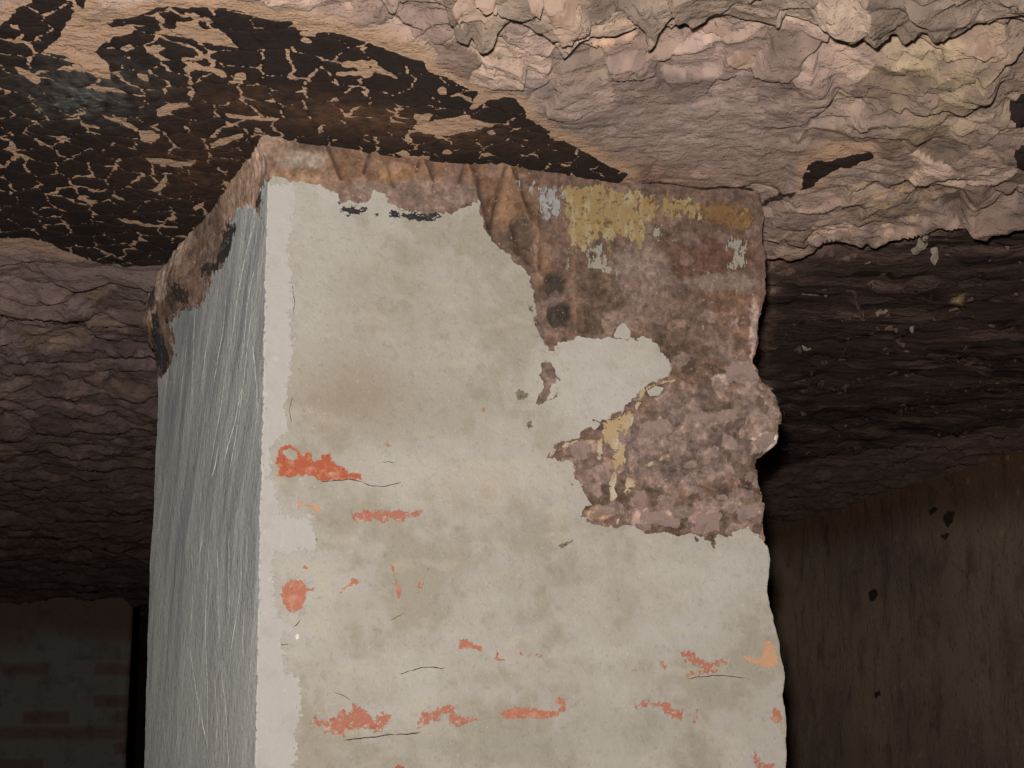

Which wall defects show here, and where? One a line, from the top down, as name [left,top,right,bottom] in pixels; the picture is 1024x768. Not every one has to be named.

damp [338,201,442,222]
damp [151,312,170,375]
damp [179,219,257,477]
spalling [536,362,561,405]
spalling [547,345,782,549]